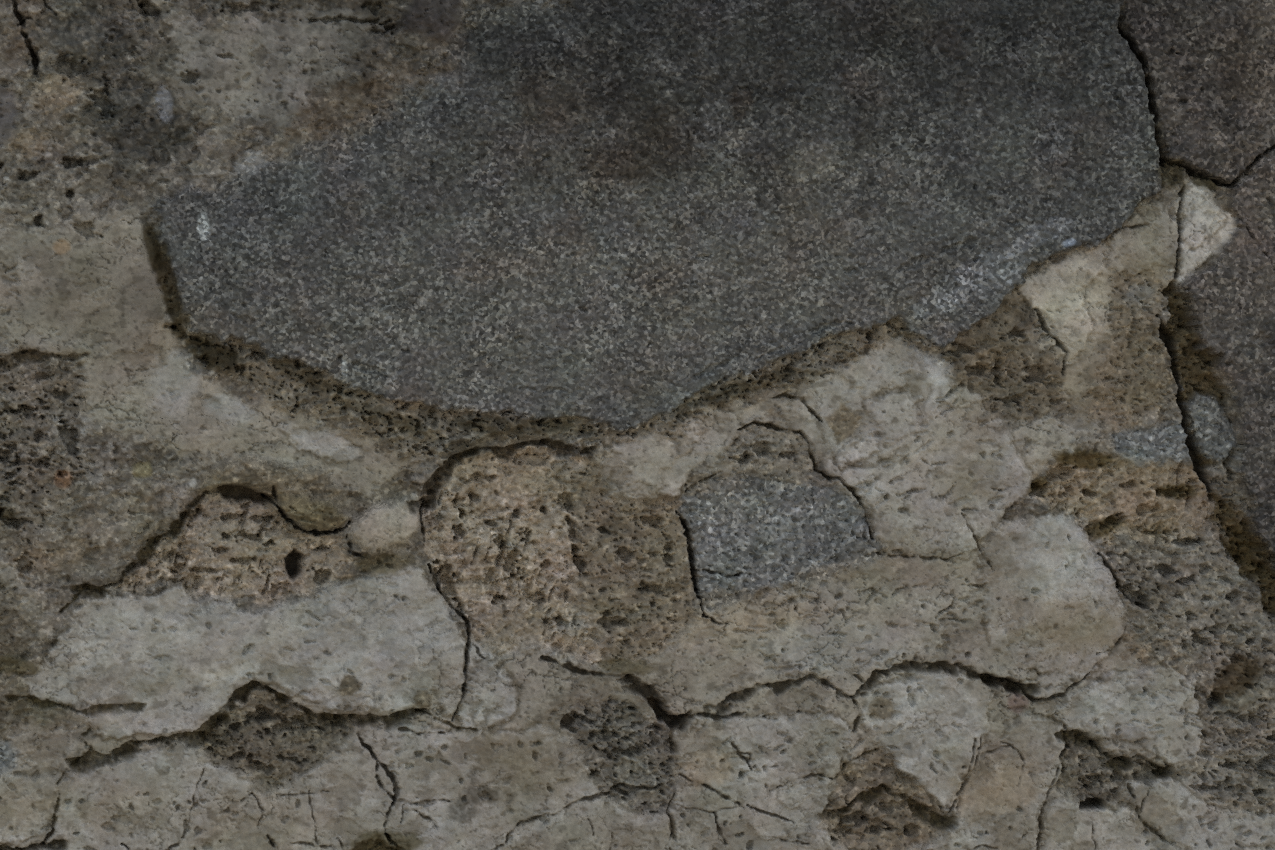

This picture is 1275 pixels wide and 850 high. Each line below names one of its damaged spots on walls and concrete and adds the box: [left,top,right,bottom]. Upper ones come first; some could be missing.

spalling [119,489,352,607]
crack [0,438,600,850]
flaking render [460,643,517,732]
spalling [186,316,942,500]
spalling [559,699,678,816]
crack [675,473,752,626]
crack [491,551,1182,850]
spalling [751,748,946,850]
crack [737,390,994,572]
spalling [1032,461,1275,817]
spalling [1082,180,1239,431]
crack [1101,18,1275,617]